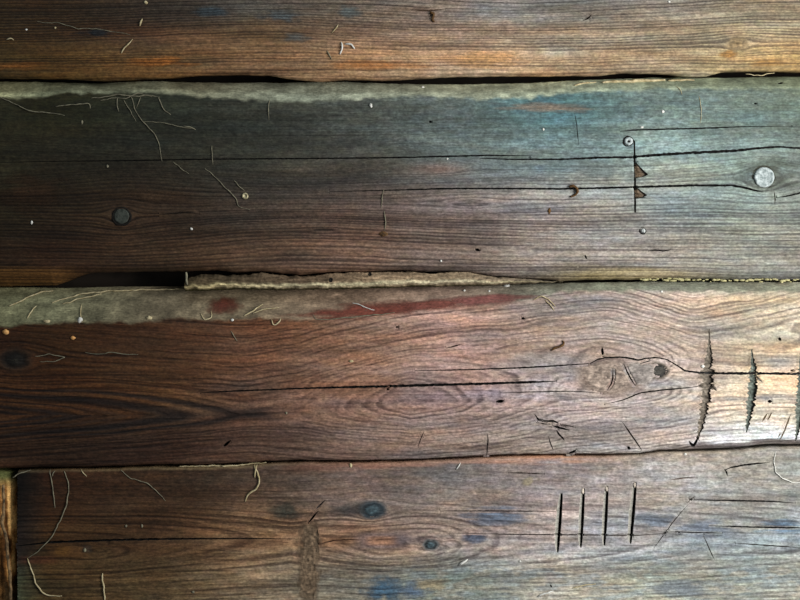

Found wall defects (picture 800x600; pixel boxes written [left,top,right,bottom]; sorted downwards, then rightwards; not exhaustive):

crack [0,124,800,165]
crack [330,181,800,200]
leakage [380,294,524,311]
crack [200,354,800,407]
crack [440,508,800,550]